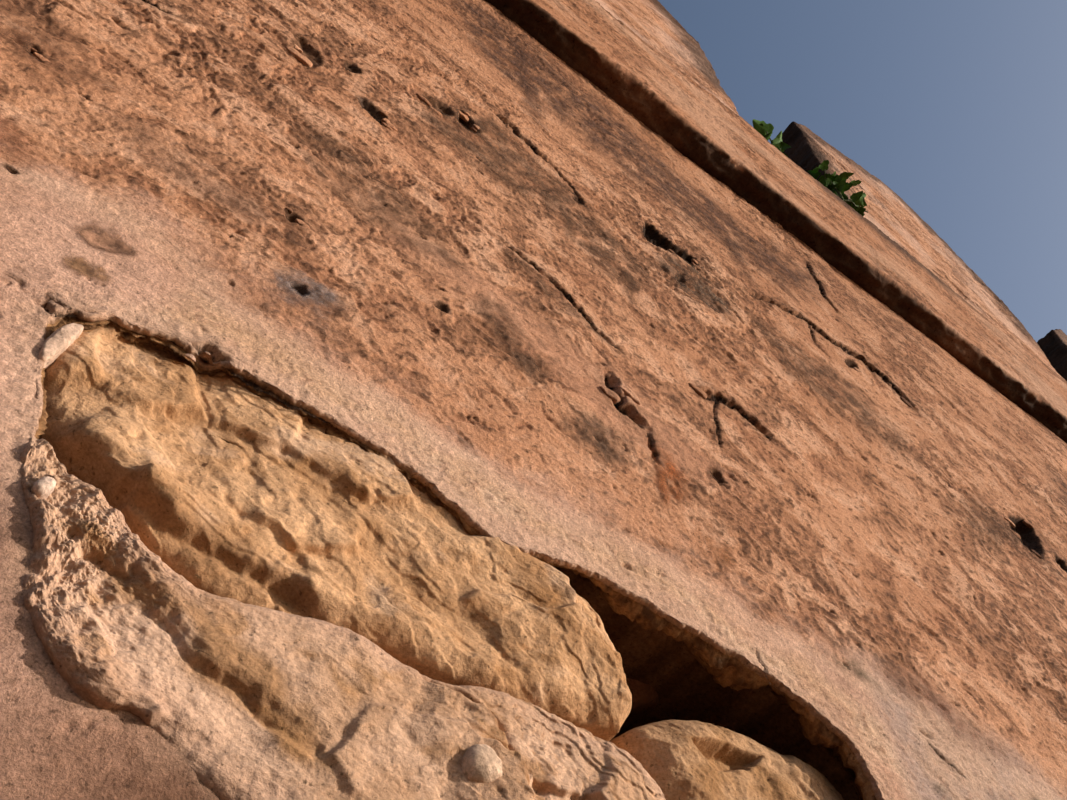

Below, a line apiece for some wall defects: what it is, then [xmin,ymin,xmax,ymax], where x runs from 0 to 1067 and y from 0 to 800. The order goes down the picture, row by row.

crack [806,263,825,298]
crack [749,293,913,409]
crack [688,383,770,445]
flaking render [19,306,884,800]